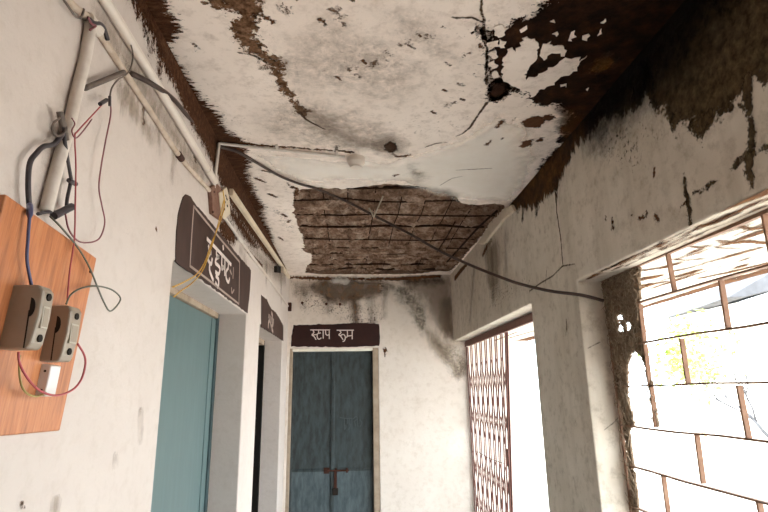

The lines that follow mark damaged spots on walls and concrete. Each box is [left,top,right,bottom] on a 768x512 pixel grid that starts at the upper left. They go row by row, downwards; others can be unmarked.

spalling [131,0,516,282]
crack [426,0,488,147]
peeling [464,0,685,173]
water stain [298,279,391,323]
crack [530,192,570,291]